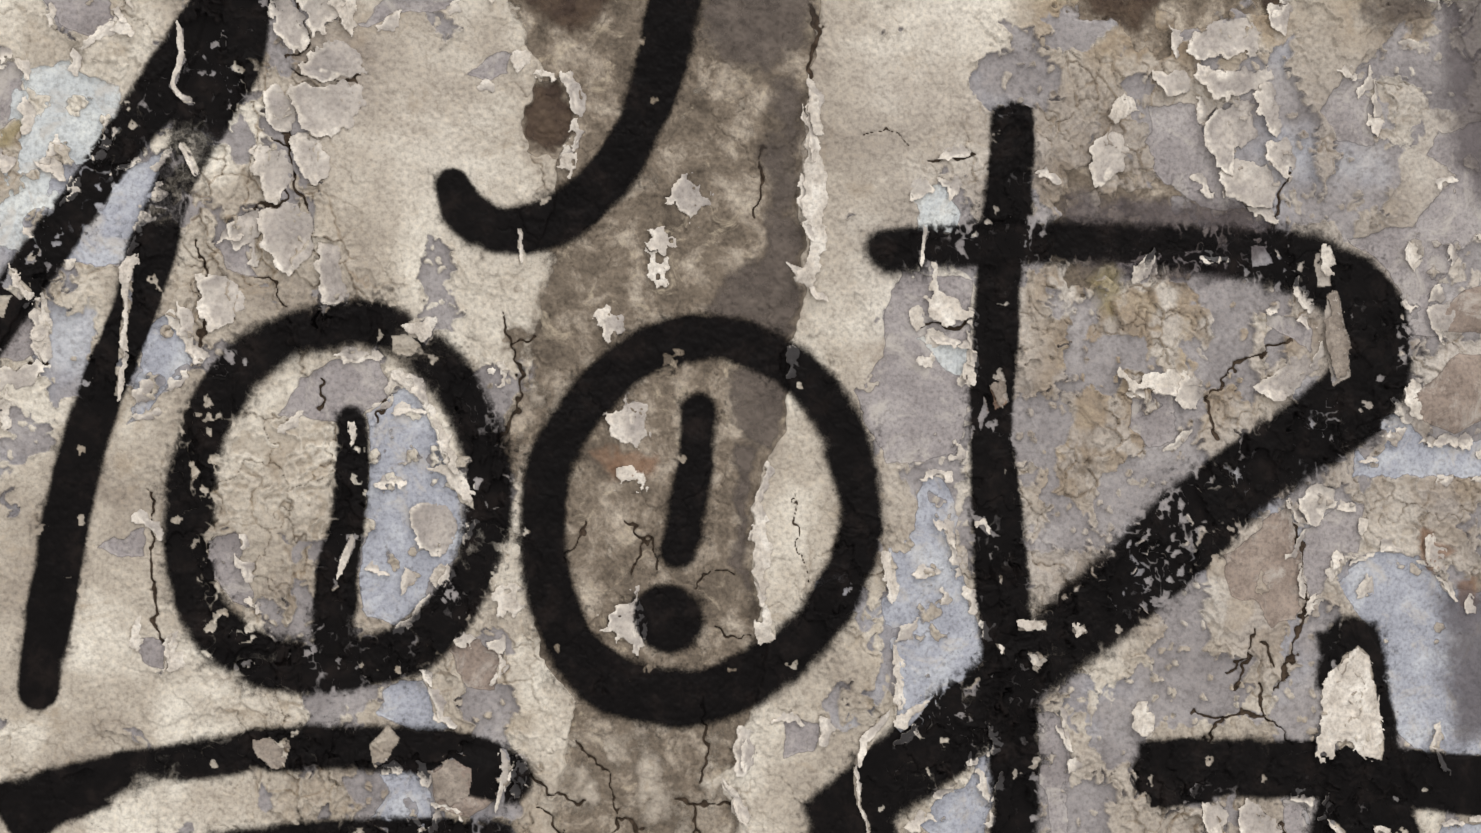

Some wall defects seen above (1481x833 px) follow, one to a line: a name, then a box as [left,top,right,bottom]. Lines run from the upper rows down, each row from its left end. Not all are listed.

peeling [0,0,461,431]
peeling [277,345,480,635]
flaking render [468,0,829,682]
peeling [853,143,1008,833]
peeling [1035,0,1296,225]
peeling [1253,244,1352,401]
peeling [1352,374,1481,487]
peeling [371,758,470,833]
crack [531,740,645,833]
flaking render [449,583,757,833]
crack [675,723,731,833]
peeling [1224,483,1481,776]